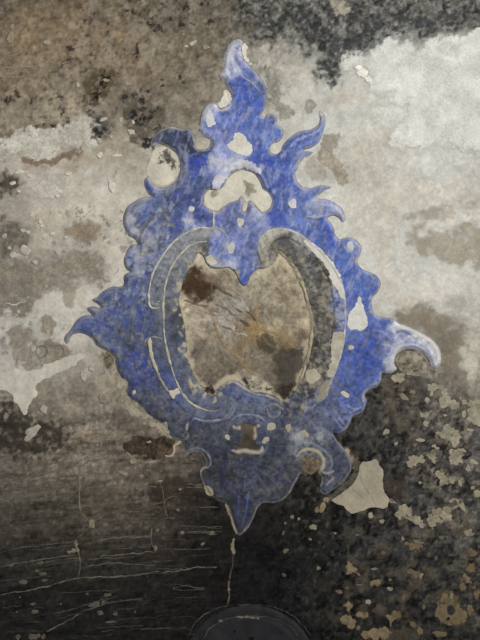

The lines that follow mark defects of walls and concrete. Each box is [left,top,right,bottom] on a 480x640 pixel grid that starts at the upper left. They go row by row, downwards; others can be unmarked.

water stain [232,0,480,86]
water stain [120,89,165,149]
peeling [147,146,179,186]
peeling [204,132,271,211]
water stain [0,215,109,317]
water stain [0,401,69,459]
water stain [0,315,71,369]
peeling [0,353,94,415]
peeling [306,296,368,402]
peeling [391,351,480,473]
spalling [315,444,466,529]
crack [0,452,237,639]